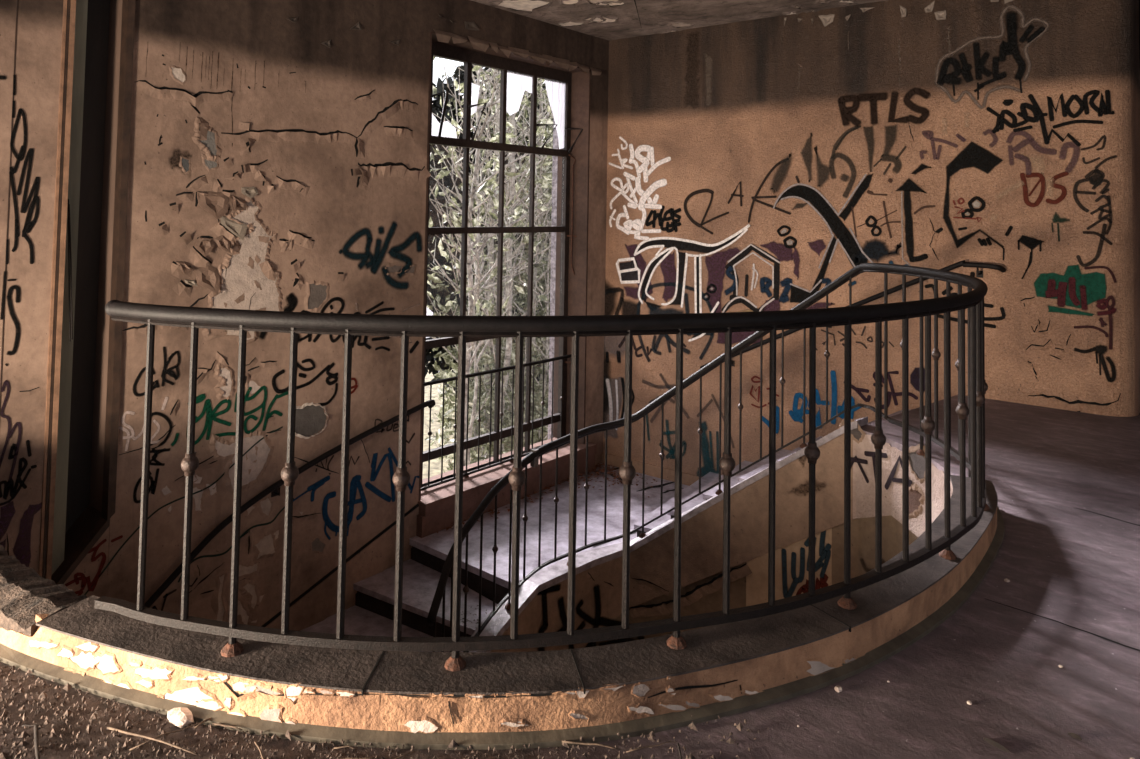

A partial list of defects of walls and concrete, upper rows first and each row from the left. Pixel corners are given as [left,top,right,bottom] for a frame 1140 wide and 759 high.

peeling [493,0,628,27]
crack [122,54,431,341]
spalling [175,187,283,311]
spalling [200,328,259,344]
spalling [295,402,328,439]
spalling [805,652,866,676]
spalling [29,638,356,724]
spalling [429,693,530,703]
spalling [552,676,764,722]
spalling [402,716,440,733]
spalling [499,718,530,729]